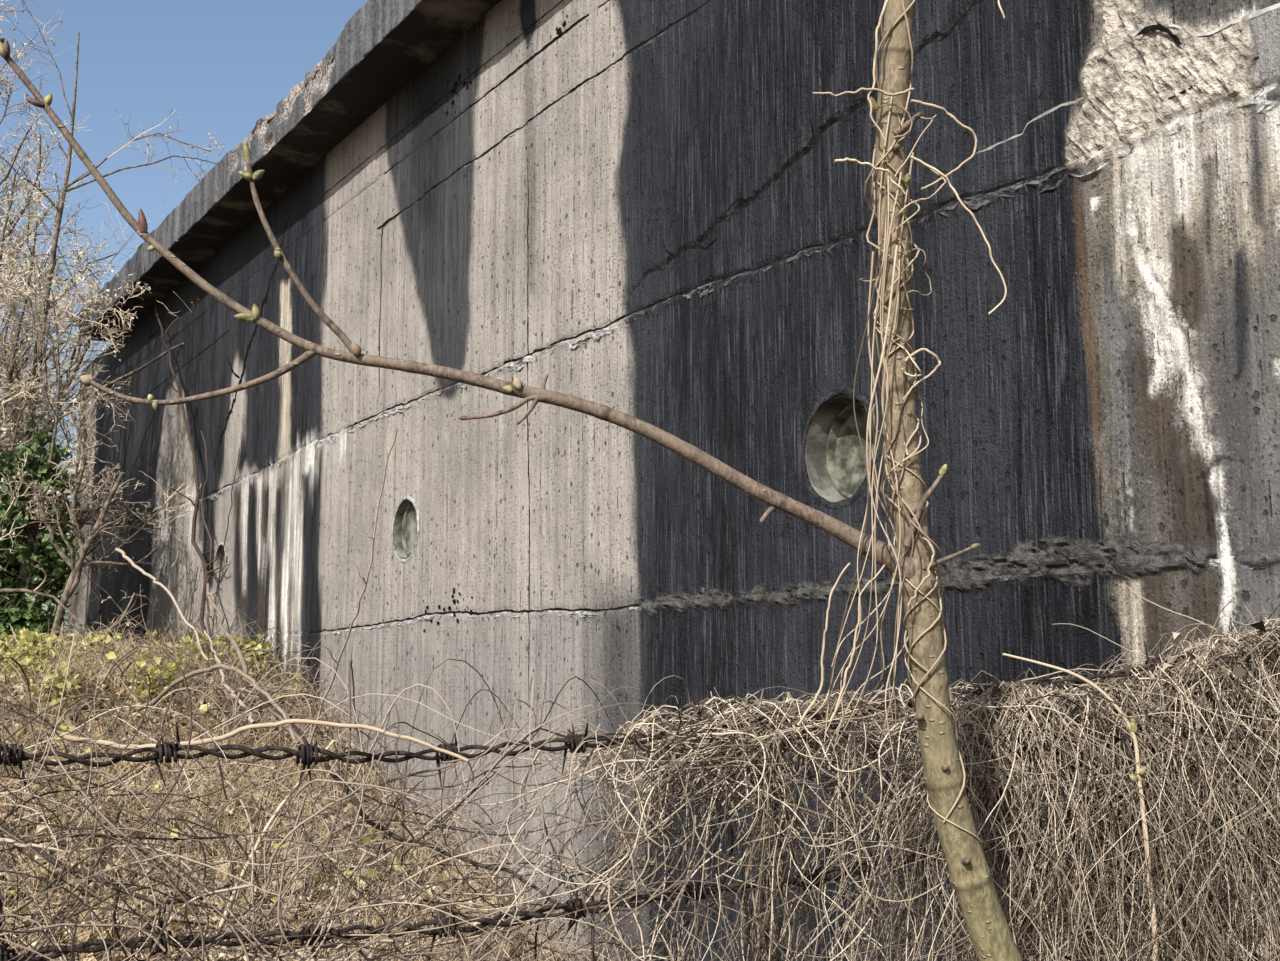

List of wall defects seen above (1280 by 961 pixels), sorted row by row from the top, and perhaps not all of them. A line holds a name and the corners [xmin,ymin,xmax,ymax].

crack [629,90,878,298]
crack [913,0,983,61]
crack [976,96,1086,154]
spalling [1065,0,1280,165]
water stain [86,156,347,708]
water stain [588,0,976,961]
water stain [905,0,1280,707]
water stain [967,733,1134,961]